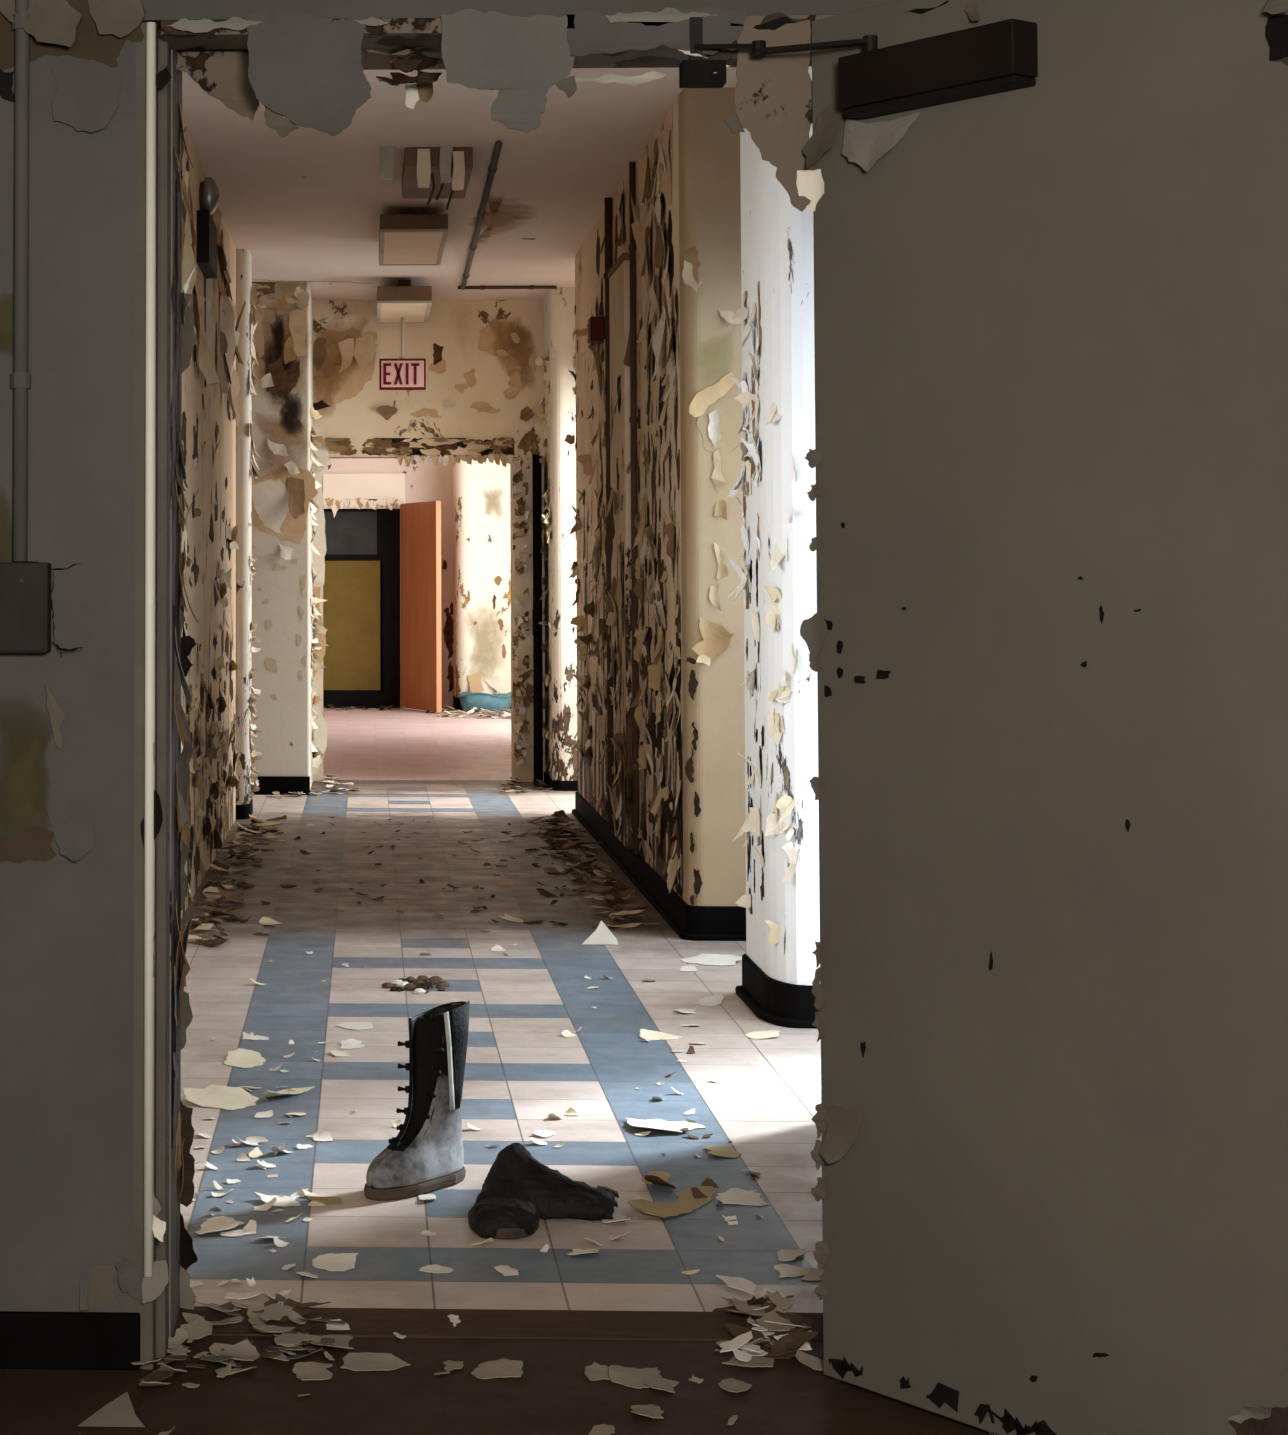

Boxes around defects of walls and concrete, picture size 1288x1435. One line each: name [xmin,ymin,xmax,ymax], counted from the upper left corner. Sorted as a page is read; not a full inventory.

peeling [0,0,146,103]
peeling [156,65,172,89]
flaking render [366,47,442,109]
peeling [753,13,812,43]
water stain [499,325,530,384]
peeling [564,123,891,945]
peeling [812,939,827,1042]
peeling [625,994,742,1158]
peeling [691,1173,769,1241]
peeling [774,1240,831,1300]
peeling [828,1357,863,1378]
peeling [1228,1405,1288,1435]